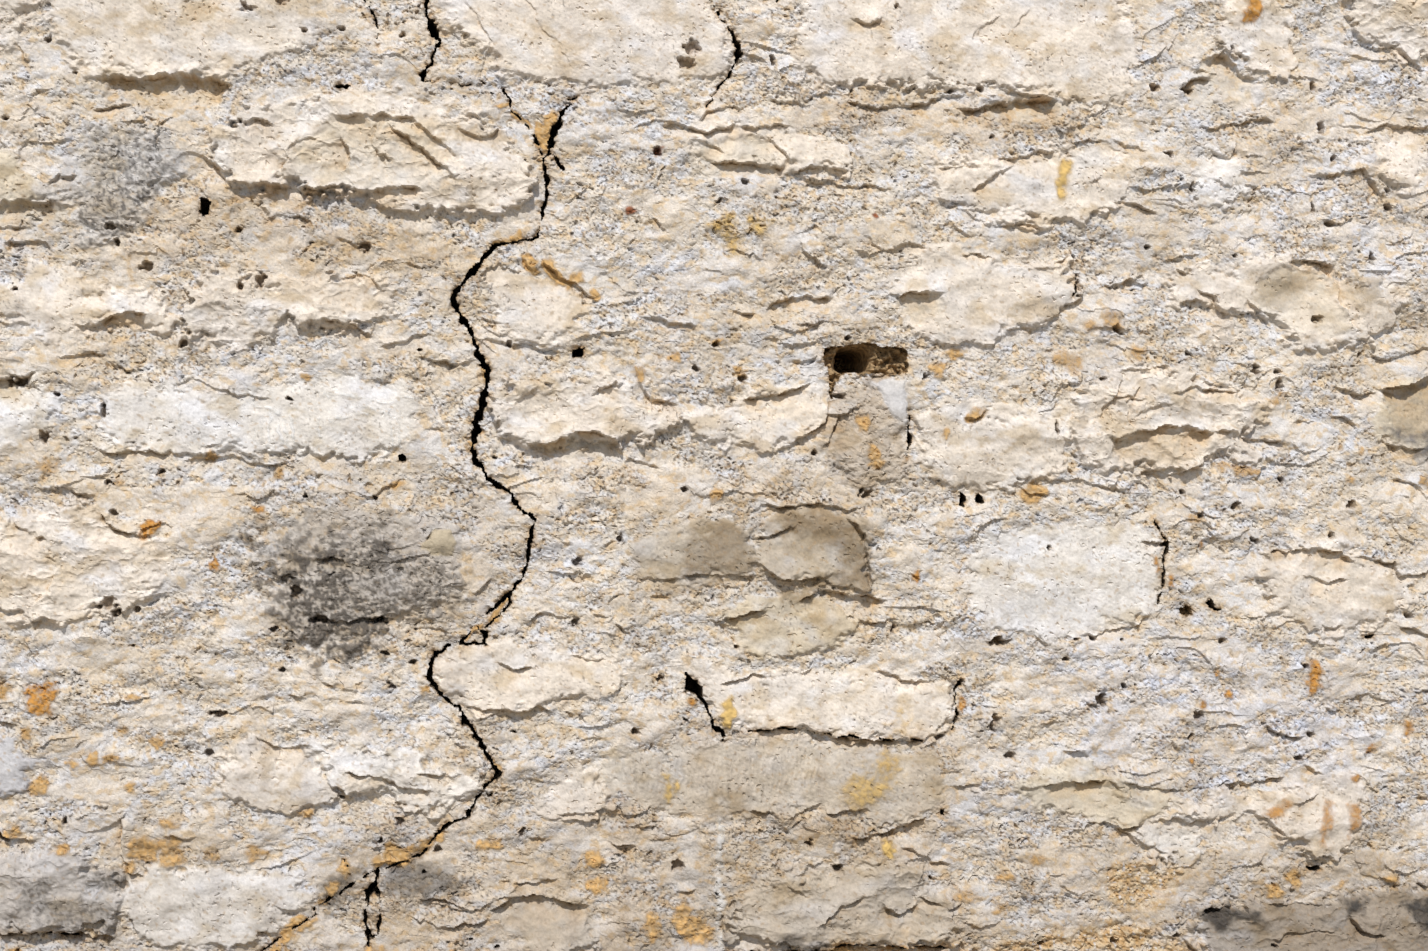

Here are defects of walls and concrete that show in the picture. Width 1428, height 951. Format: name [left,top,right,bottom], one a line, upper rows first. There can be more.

crack [706,0,743,108]
crack [262,0,577,951]
crack [684,672,962,742]